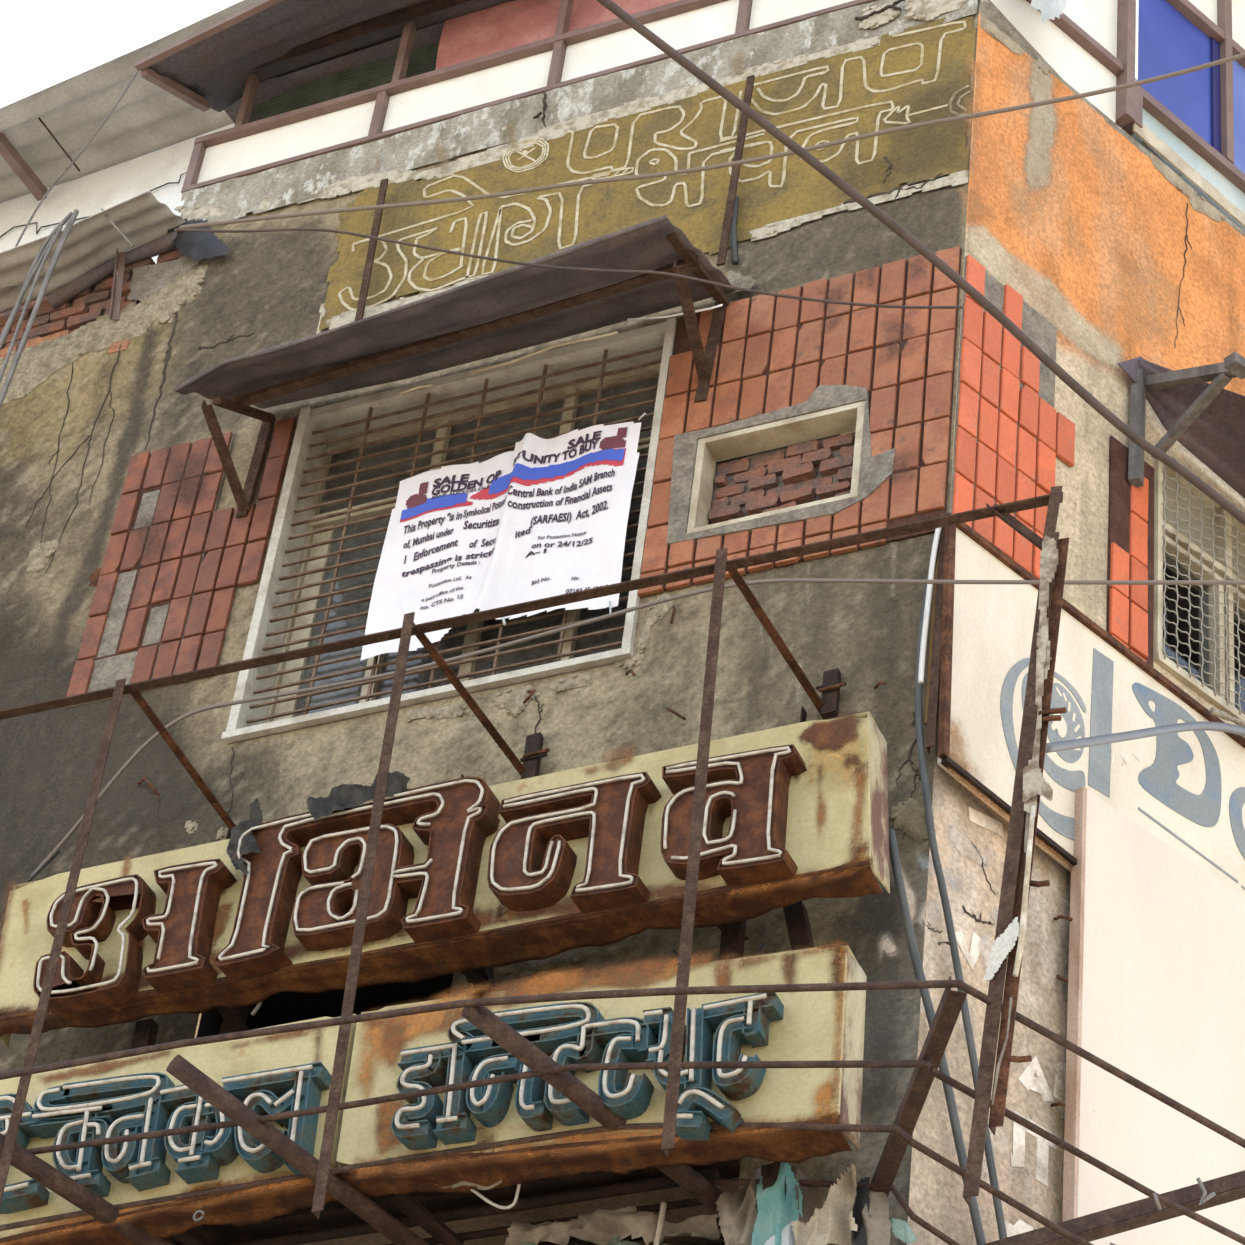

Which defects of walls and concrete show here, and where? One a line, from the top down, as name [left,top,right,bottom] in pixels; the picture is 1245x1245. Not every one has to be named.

peeling [252,0,966,212]
peeling [979,10,1057,189]
spalling [0,254,221,404]
peeling [174,205,225,221]
peeling [316,273,494,334]
peeling [750,170,969,241]
crack [1142,141,1192,341]
spalling [1150,152,1225,222]
crack [25,340,123,573]
crack [921,842,996,946]